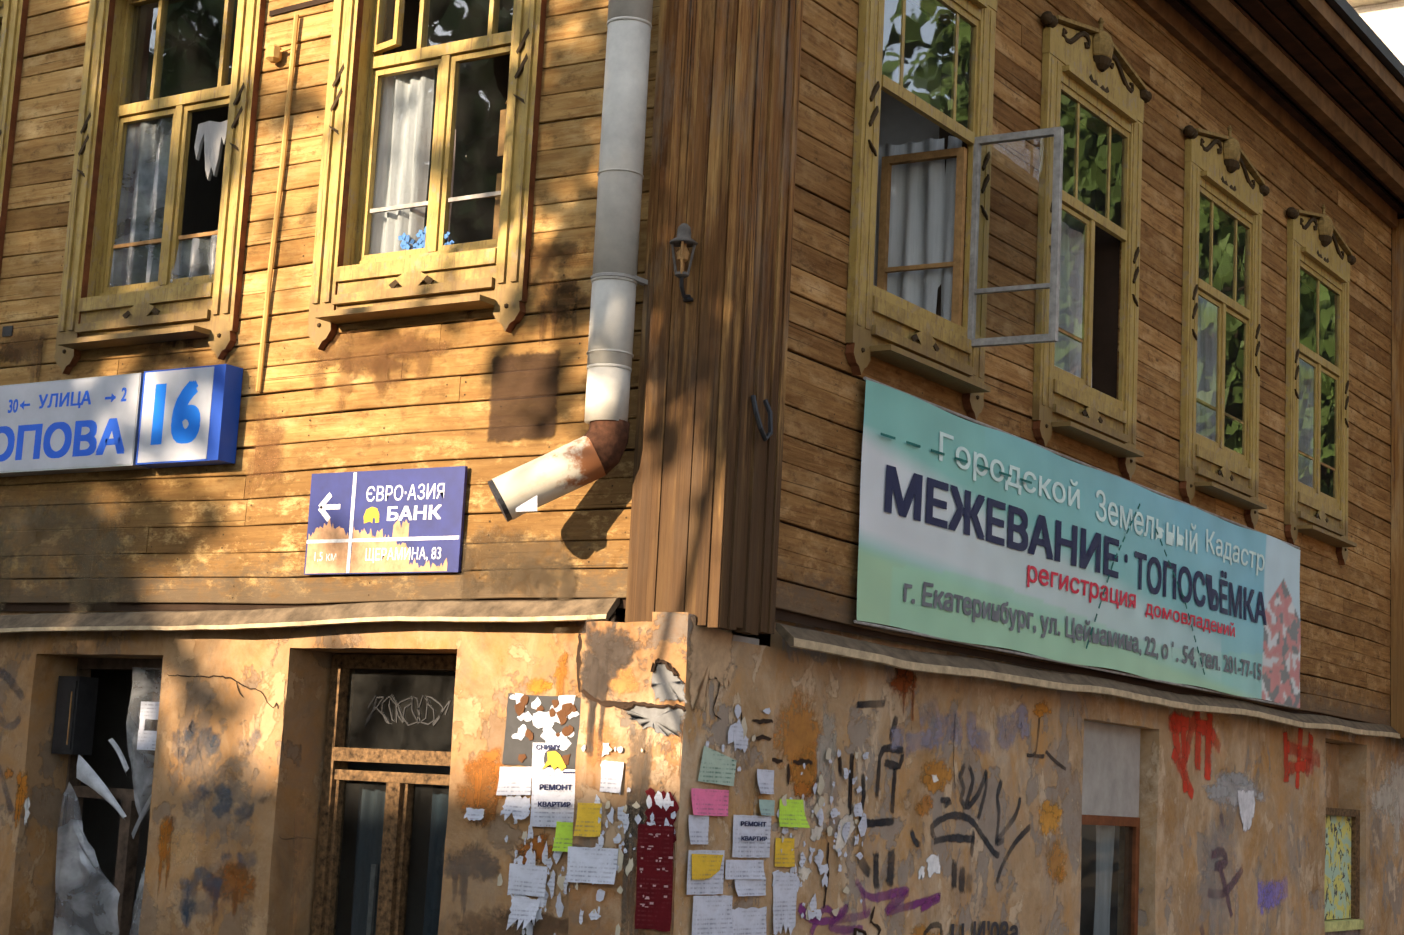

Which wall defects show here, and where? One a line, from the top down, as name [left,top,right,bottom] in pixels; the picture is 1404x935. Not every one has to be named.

crack [167,674,286,748]
flaking render [610,615,734,737]